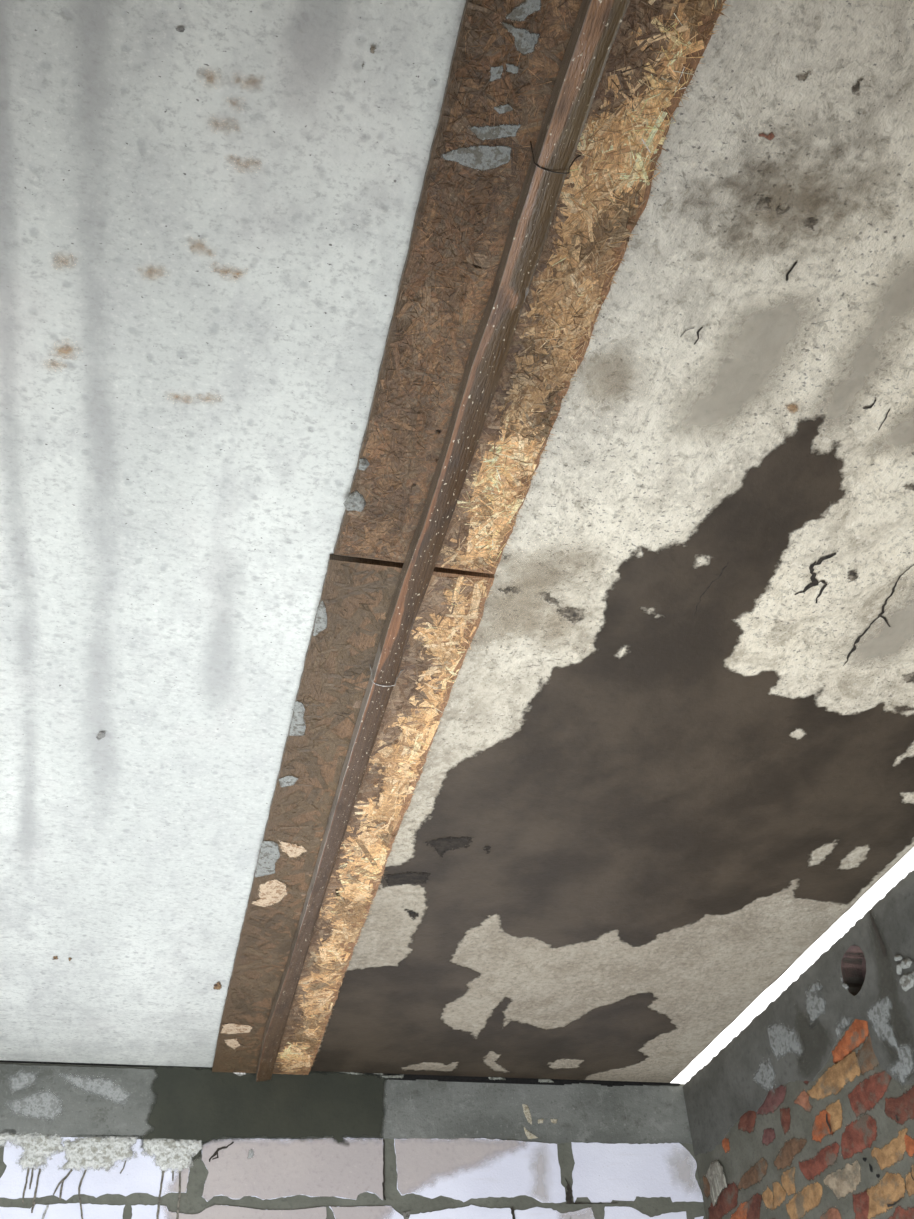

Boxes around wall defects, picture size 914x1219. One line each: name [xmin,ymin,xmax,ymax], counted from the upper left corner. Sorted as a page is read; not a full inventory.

crack [794,553,836,603]
crack [843,565,913,666]
damp [142,267,914,1219]
spalling [840,945,866,996]
flaking render [894,955,914,992]
flaking render [706,1160,727,1206]